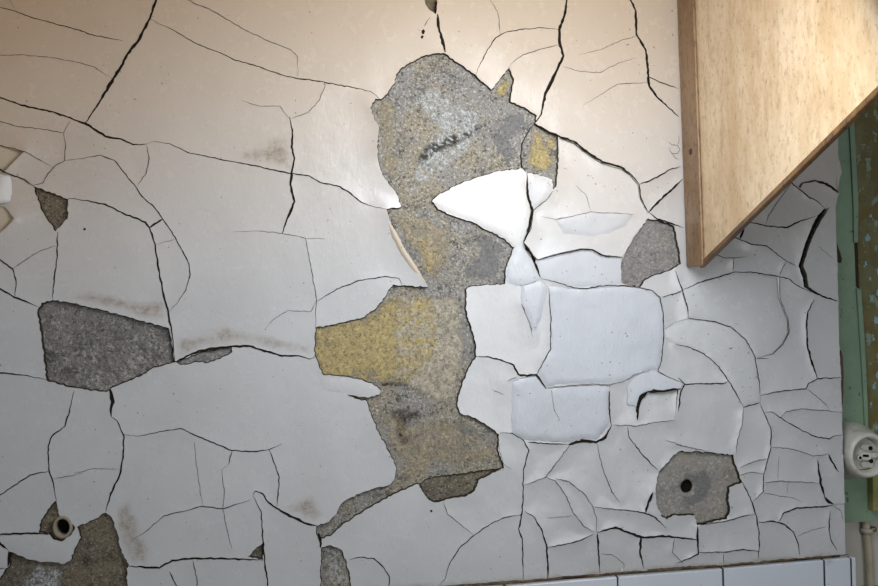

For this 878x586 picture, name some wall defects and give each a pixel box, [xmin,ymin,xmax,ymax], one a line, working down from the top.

spalling [421,0,437,39]
crack [437,14,446,52]
peeling [0,146,68,268]
spalling [37,300,232,392]
crack [0,0,402,363]
spalling [314,53,559,586]
crack [441,0,843,583]
spalling [621,219,681,287]
crack [0,389,322,586]
spalling [646,451,741,527]
spalling [0,501,129,586]
crack [350,557,390,585]